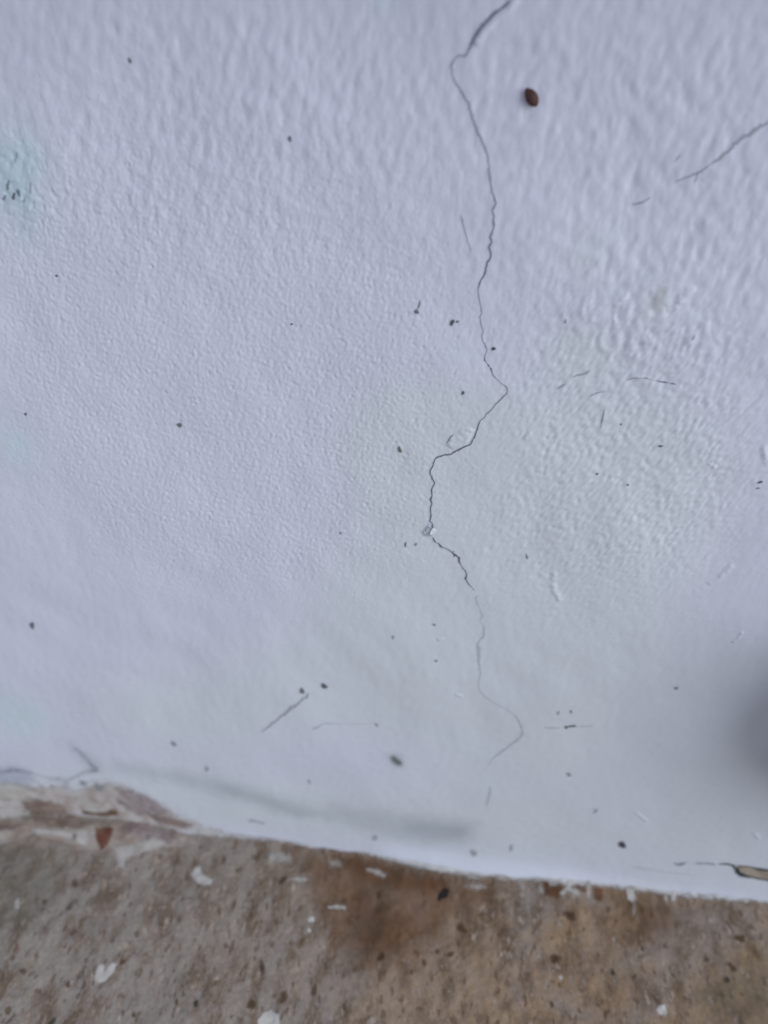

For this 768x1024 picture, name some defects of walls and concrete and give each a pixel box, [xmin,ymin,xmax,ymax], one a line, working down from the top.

crack [470,0,521,49]
crack [478,214,495,289]
crack [429,354,508,590]